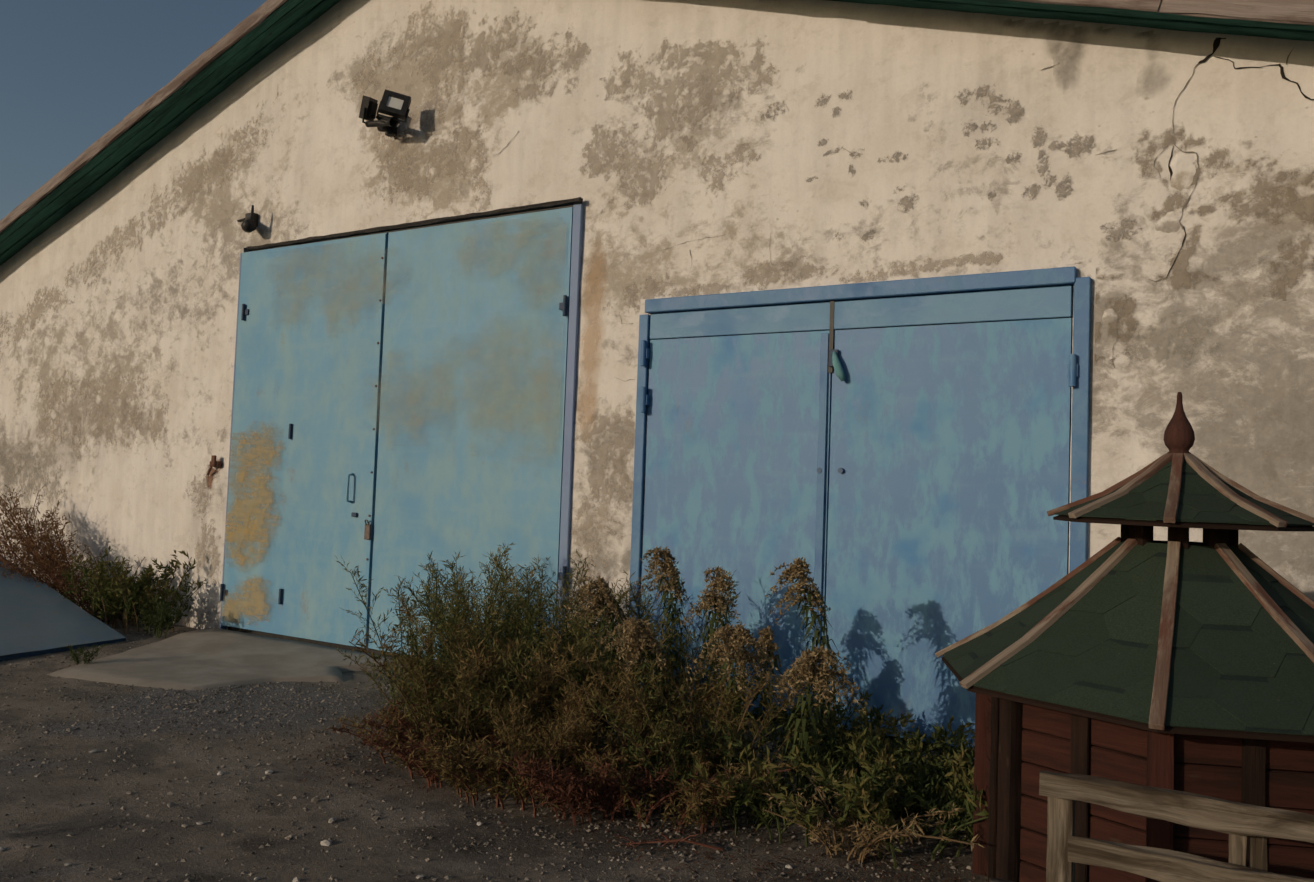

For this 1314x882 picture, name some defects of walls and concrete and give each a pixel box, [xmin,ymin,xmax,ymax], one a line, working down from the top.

flaking render [354,3,590,196]
flaking render [580,39,775,208]
flaking render [817,90,852,118]
flaking render [819,139,860,174]
flaking render [897,187,918,211]
flaking render [958,86,1095,199]
flaking render [1101,129,1314,301]
crack [1112,37,1314,368]
flaking render [1094,269,1137,361]
corrosion [206,432,282,565]
corrosion [222,579,269,622]